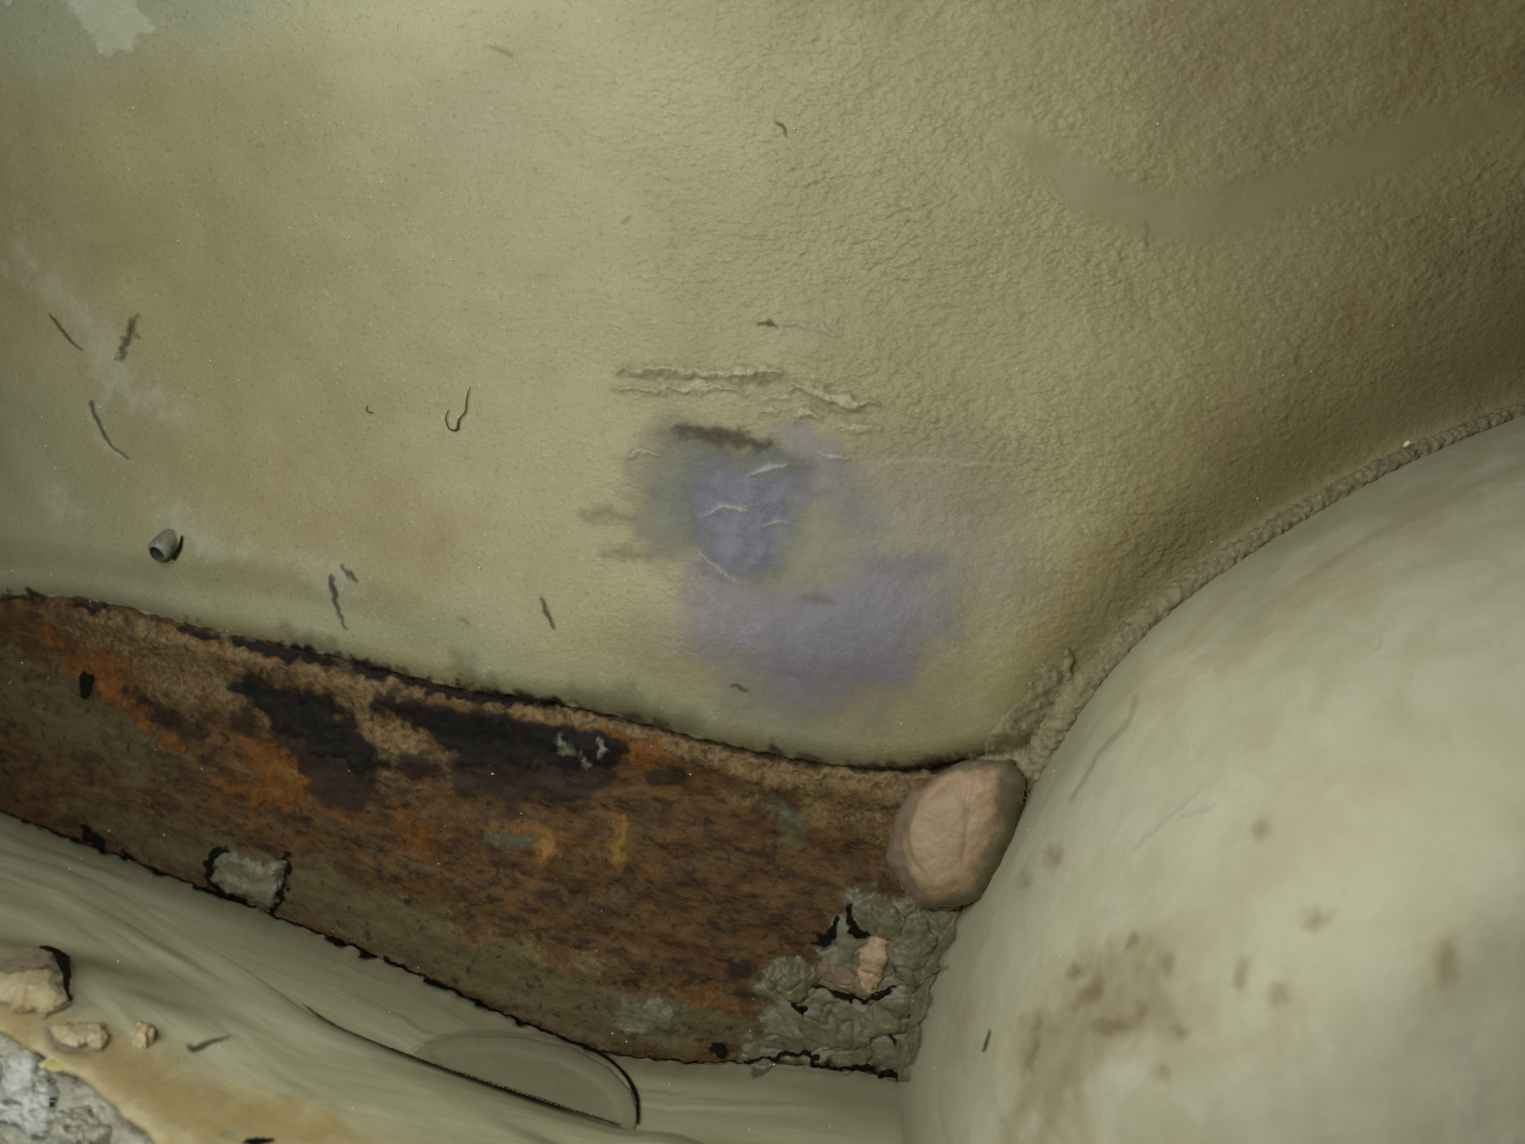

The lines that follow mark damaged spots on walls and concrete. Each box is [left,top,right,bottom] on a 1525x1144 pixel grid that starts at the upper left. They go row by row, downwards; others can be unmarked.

peeling [614,363,882,433]
corrosion [0,587,985,1064]
peeling [266,876,279,907]
peeling [0,946,109,1072]